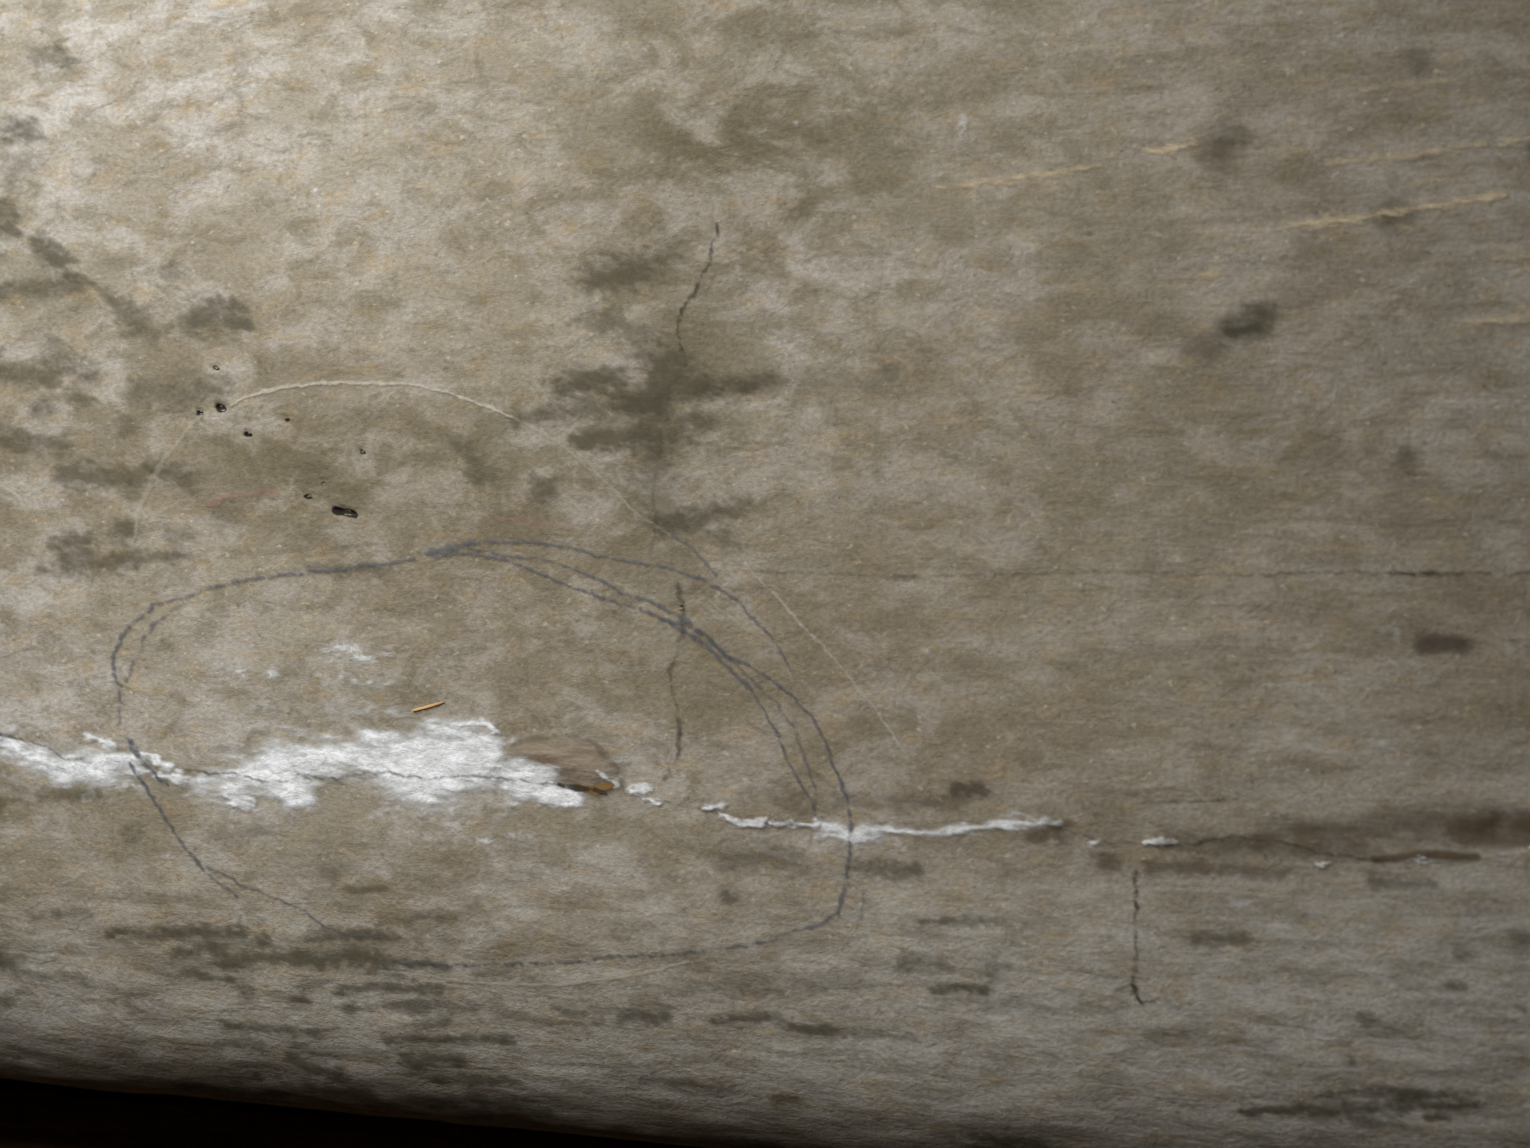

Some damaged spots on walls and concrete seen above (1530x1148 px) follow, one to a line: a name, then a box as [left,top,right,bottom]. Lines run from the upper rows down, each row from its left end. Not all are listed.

damp [0,198,69,266]
damp [569,354,751,449]
damp [327,644,372,661]
damp [0,719,584,828]
damp [597,771,661,805]
damp [702,803,1063,843]
damp [1142,837,1178,846]
damp [147,926,436,995]
damp [788,1023,831,1034]
damp [384,1035,551,1116]
damp [1238,1087,1477,1119]